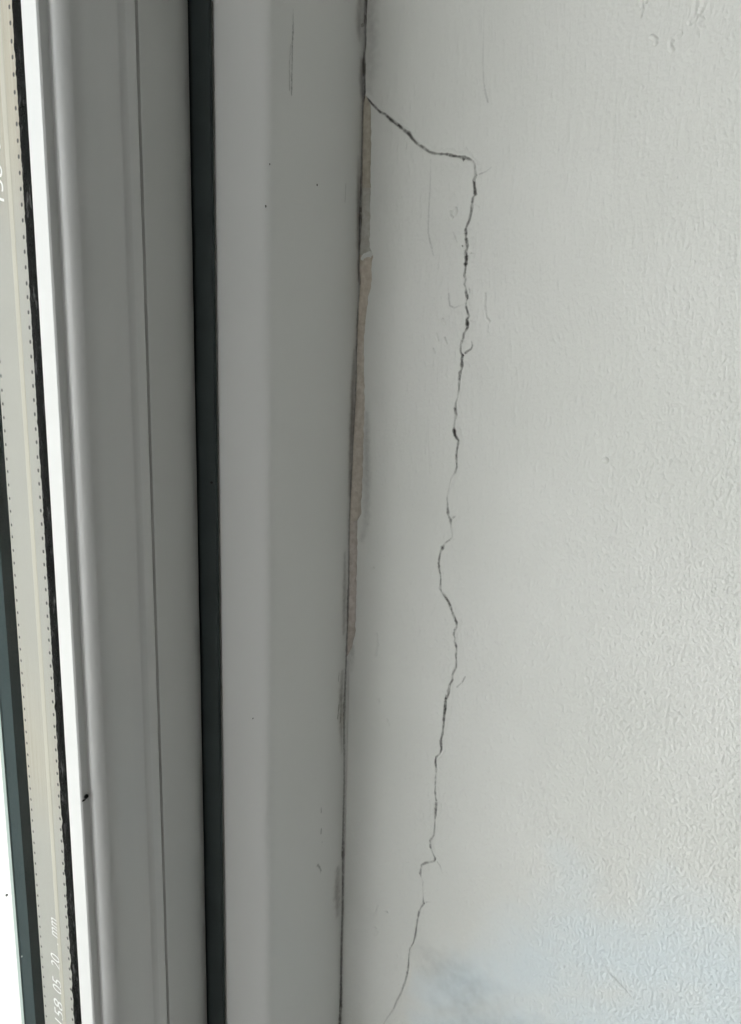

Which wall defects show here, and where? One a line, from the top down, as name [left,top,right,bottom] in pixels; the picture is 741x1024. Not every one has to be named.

crack [356,179,364,233]
crack [362,0,484,1024]
crack [337,808,345,1024]